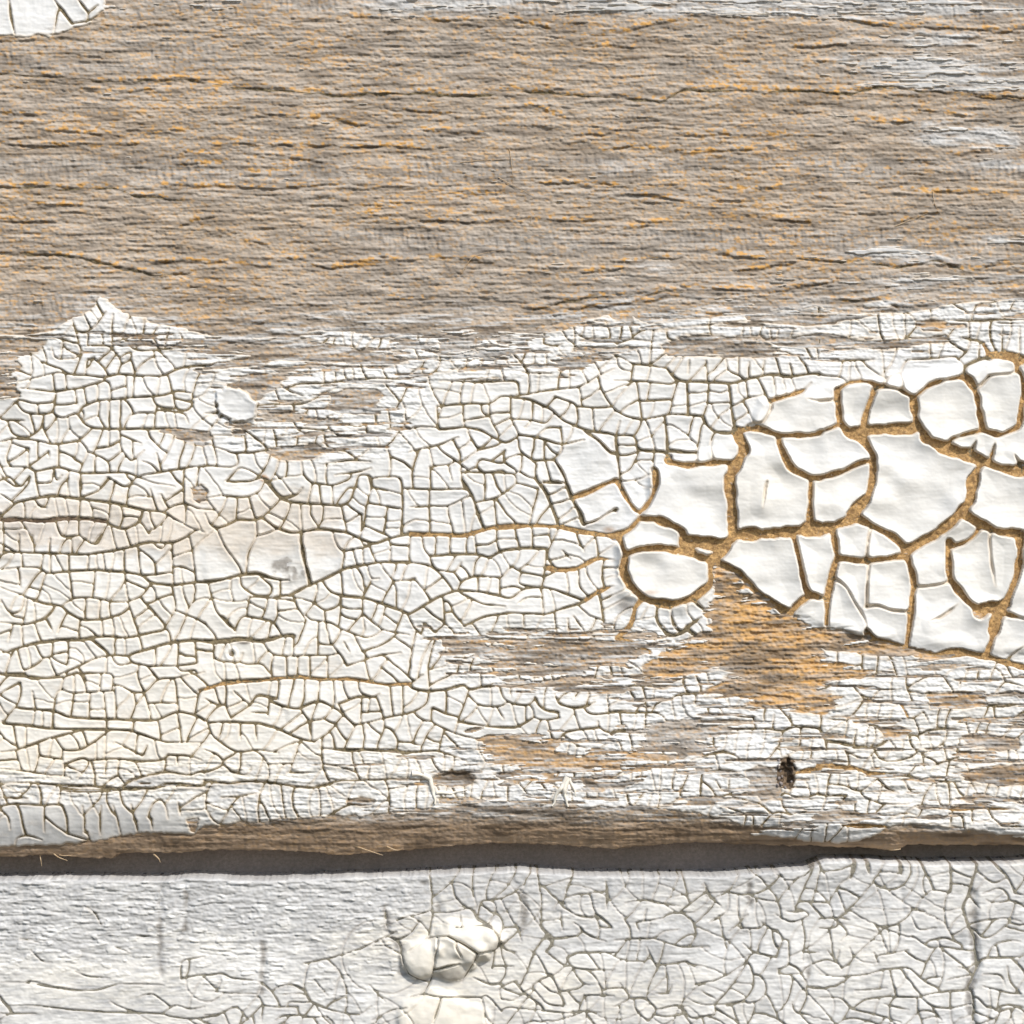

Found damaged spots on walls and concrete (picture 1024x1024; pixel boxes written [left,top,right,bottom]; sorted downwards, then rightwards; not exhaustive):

peeling [0,0,1024,716]
crack [0,300,1024,1024]
peeling [476,713,742,792]